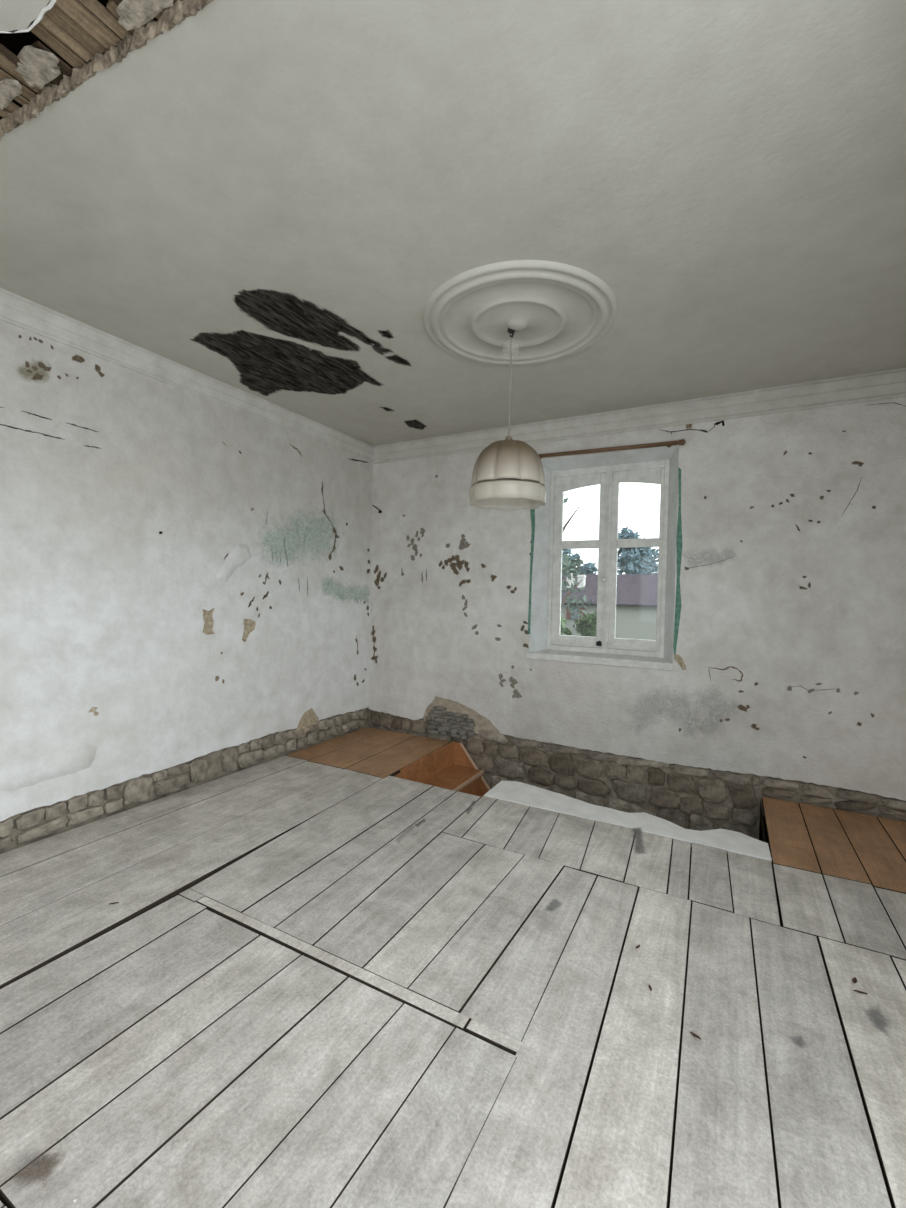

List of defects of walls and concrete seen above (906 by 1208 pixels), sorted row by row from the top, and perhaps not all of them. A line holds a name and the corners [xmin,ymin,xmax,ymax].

spalling [0,0,213,140]
peeling [57,355,104,379]
spalling [202,608,215,635]
crack [321,482,348,570]
water stain [326,571,378,686]
water stain [367,549,387,589]
peeling [401,528,517,635]
peeling [499,665,522,698]
peeling [708,666,759,730]
flaking render [0,696,906,849]